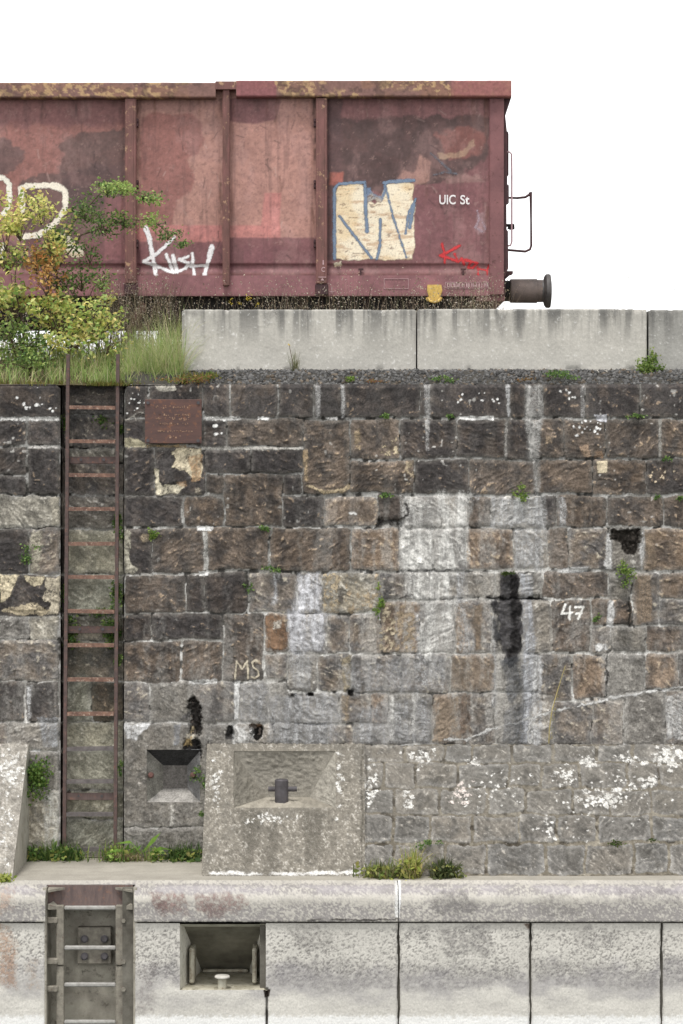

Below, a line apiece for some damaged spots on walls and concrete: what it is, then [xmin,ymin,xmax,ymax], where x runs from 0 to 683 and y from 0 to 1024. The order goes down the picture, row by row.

efflorescence [525,385,543,462]
peeling [124,438,203,495]
peeling [0,531,61,616]
peeling [50,497,60,525]
leakage [491,477,545,745]
hole [610,528,641,555]